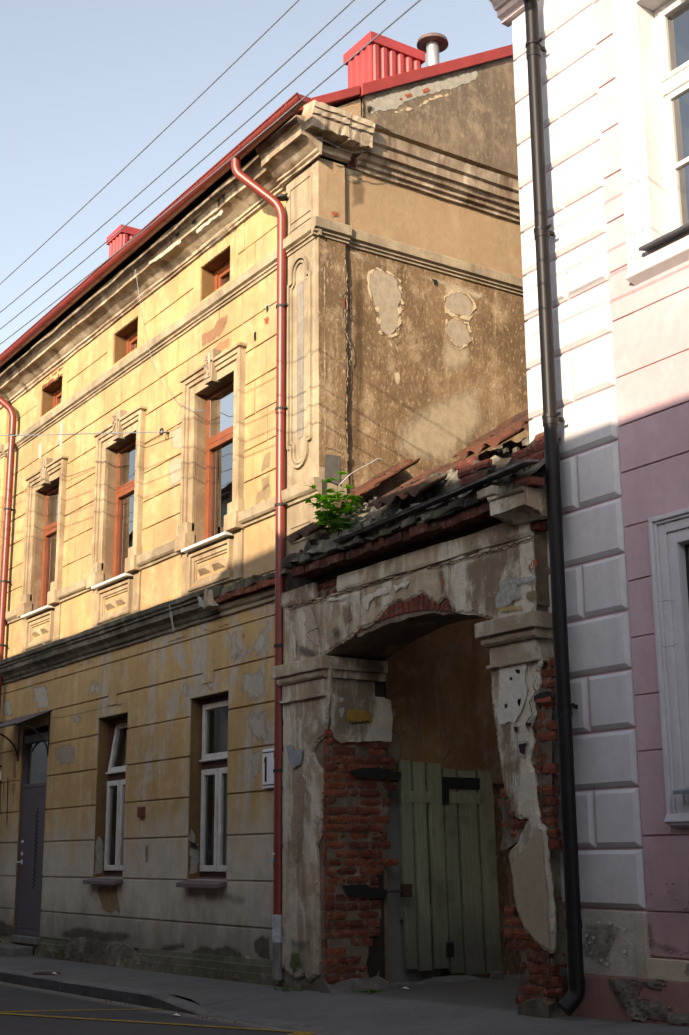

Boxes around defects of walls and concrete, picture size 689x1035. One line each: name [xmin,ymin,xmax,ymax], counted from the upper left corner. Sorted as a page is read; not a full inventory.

flaking render [395,88,448,113]
flaking render [302,580,345,648]
flaking render [355,579,454,637]
peeling [483,559,548,612]
flaking render [495,657,563,850]
flaking render [322,729,401,984]
leakage [64,928,129,942]
leakage [254,937,269,959]
flaking render [503,906,567,1005]
spalling [608,978,689,1025]